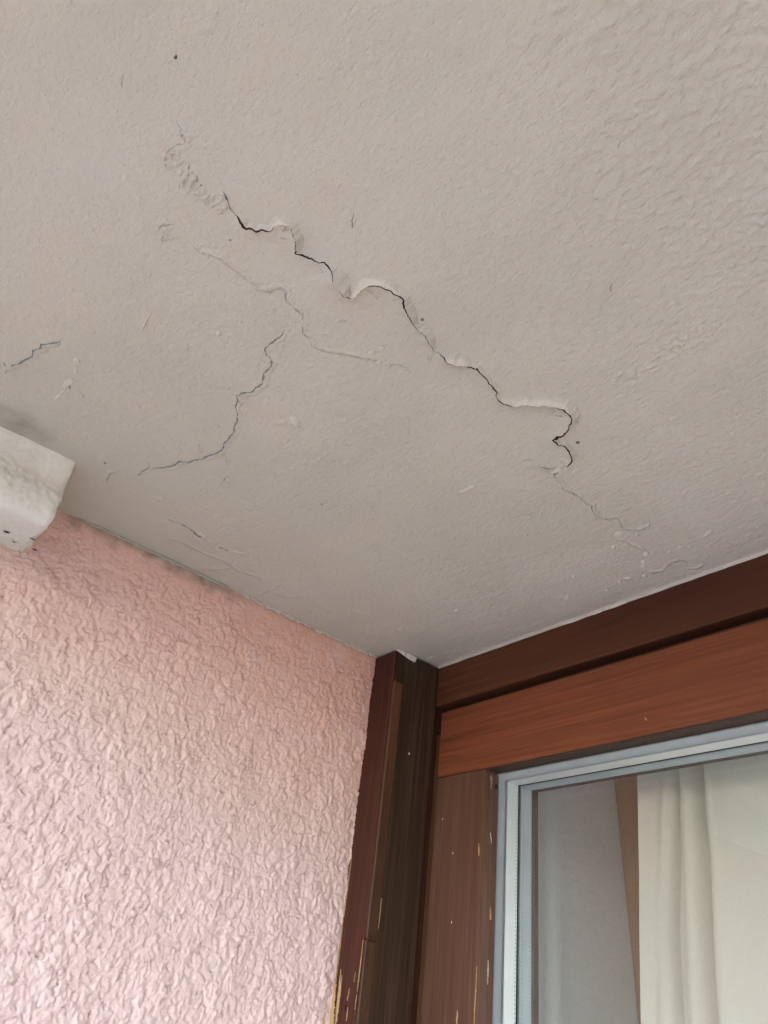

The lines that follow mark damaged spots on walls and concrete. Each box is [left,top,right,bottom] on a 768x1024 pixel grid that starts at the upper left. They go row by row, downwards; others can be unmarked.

crack [0,339,61,374]
crack [103,120,704,574]